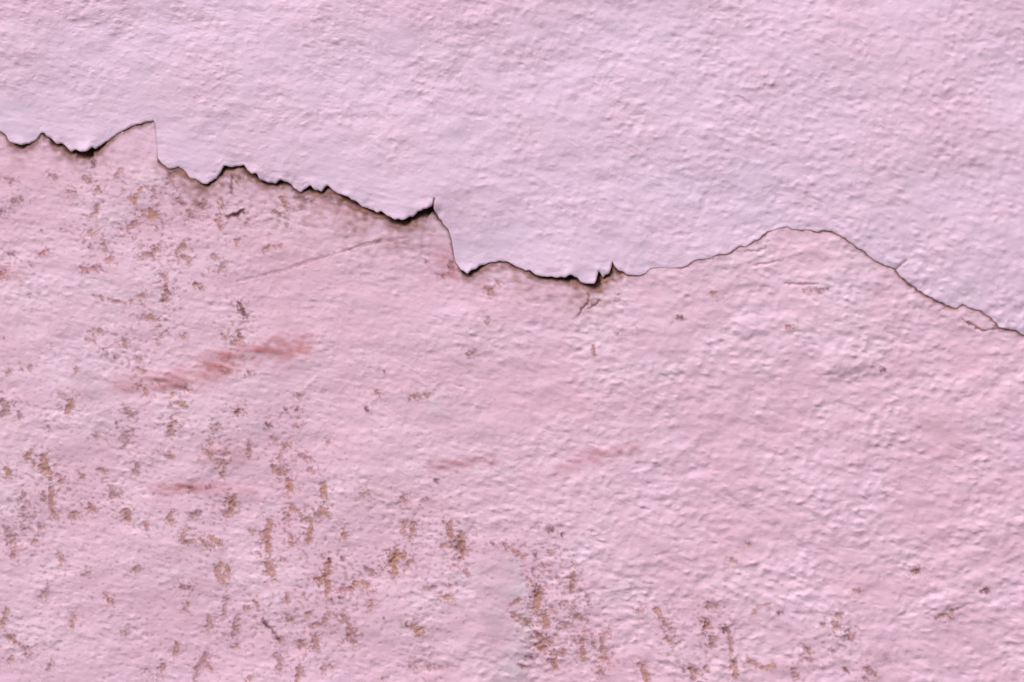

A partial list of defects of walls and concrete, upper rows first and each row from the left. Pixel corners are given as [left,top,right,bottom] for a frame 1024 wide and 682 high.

peeling [0,113,628,284]
peeling [23,449,76,519]
peeling [266,423,313,492]
peeling [0,608,27,661]
peeling [214,561,283,649]
peeling [248,482,329,580]
peeling [298,612,357,650]
peeling [313,549,414,608]
peeling [440,520,468,577]
peeling [490,542,608,675]
peeling [700,621,776,677]